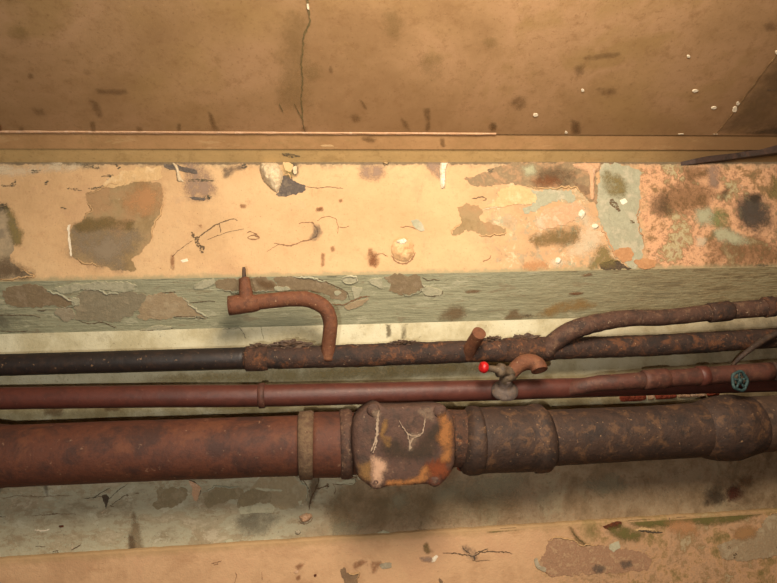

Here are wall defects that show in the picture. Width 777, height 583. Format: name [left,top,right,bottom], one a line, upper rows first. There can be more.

crack [279,0,311,130]
spalling [276,165,343,197]
peeling [451,162,657,270]
water stain [654,166,777,267]
peeling [0,163,215,331]
peeling [193,278,239,294]
peeling [250,273,443,310]
peeling [534,530,652,577]
spalling [717,512,777,562]